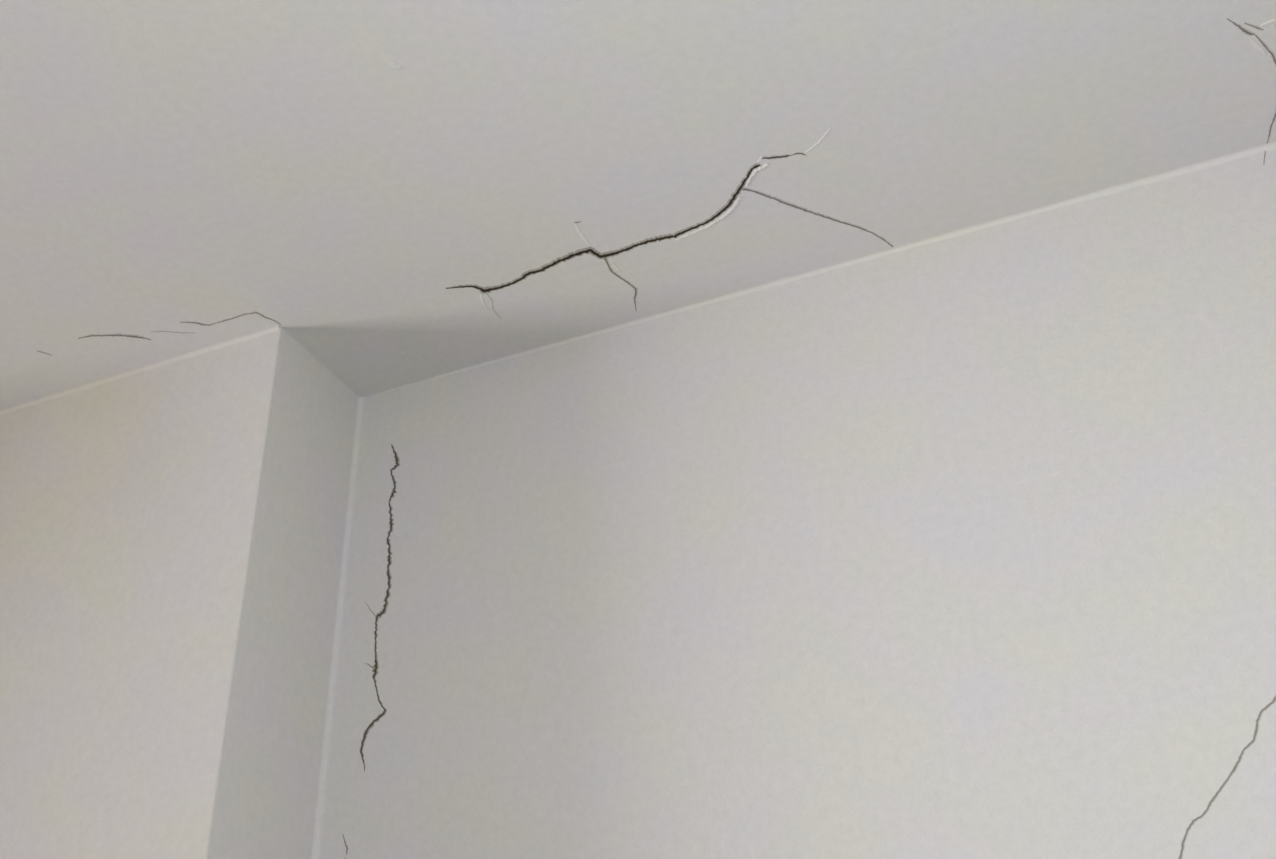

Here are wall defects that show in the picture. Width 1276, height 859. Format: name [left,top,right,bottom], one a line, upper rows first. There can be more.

crack [1227,18,1276,67]
crack [1263,107,1276,165]
crack [446,128,893,323]
crack [78,311,281,340]
crack [360,444,400,772]
crack [1178,694,1276,859]